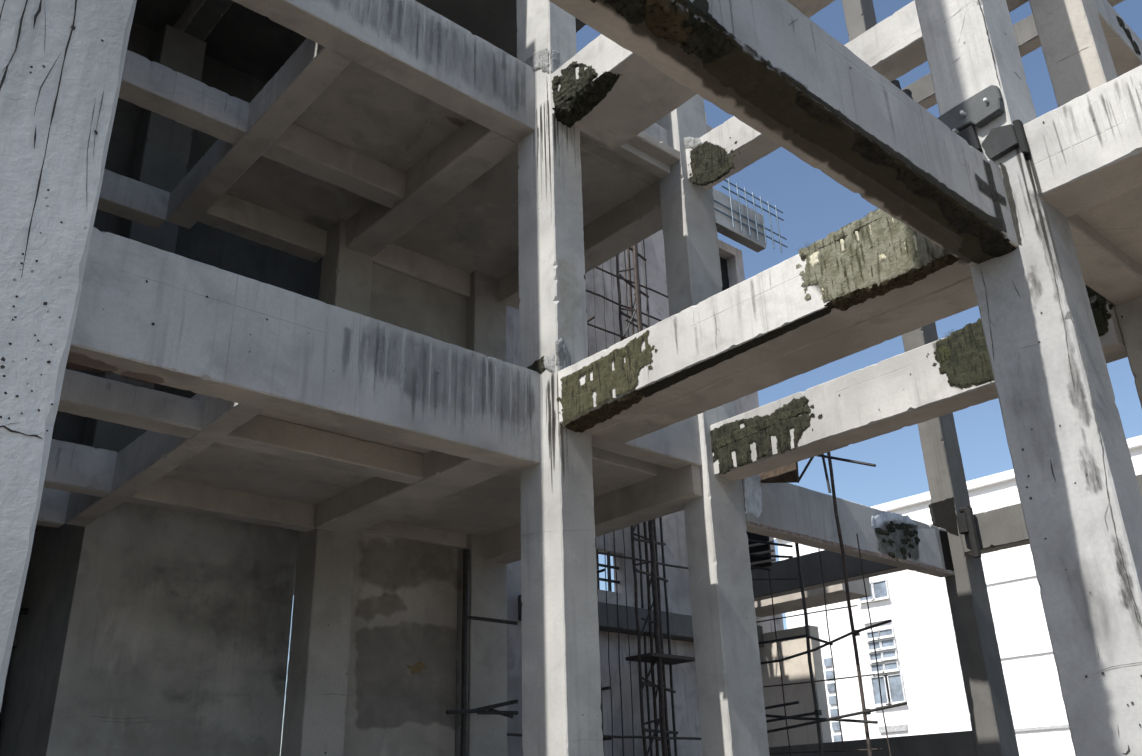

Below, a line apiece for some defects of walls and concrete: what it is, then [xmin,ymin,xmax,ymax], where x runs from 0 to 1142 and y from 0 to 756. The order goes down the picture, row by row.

crack [0,0,77,279]
crack [86,91,104,194]
leakage [533,103,568,183]
leakage [597,0,1060,267]
spalling [795,92,1017,258]
crack [0,422,42,439]